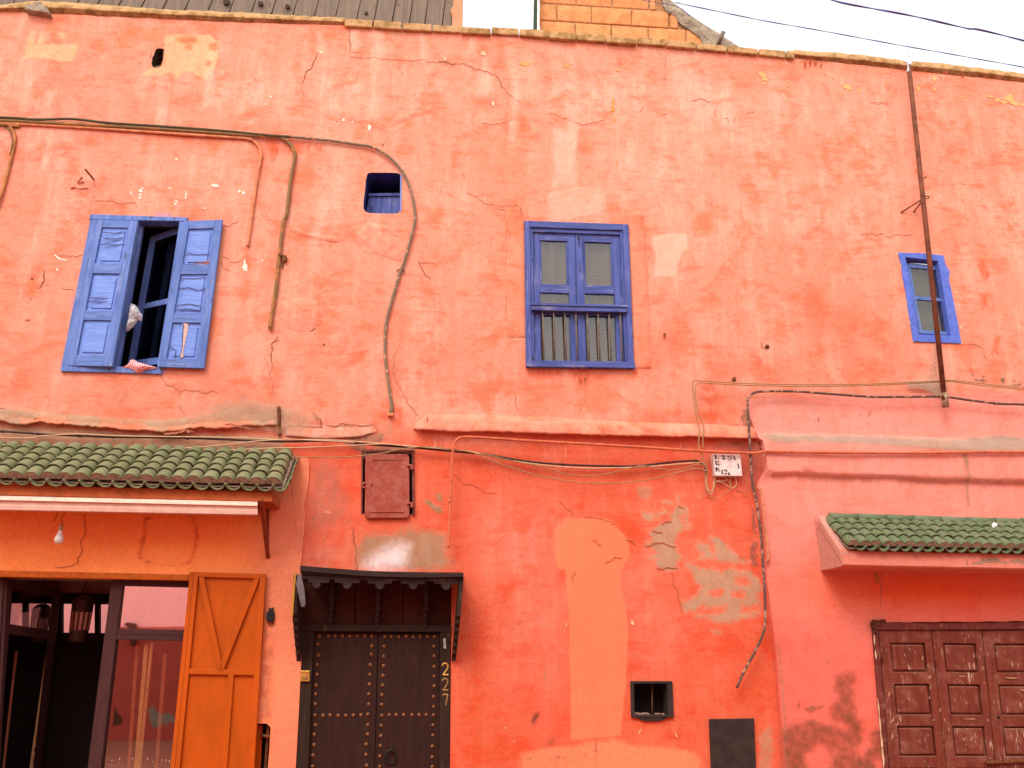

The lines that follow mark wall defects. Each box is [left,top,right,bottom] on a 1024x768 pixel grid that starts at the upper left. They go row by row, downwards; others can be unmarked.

crack [301,53,317,99]
crack [348,28,521,125]
crack [161,253,240,435]
crack [269,336,279,394]
crack [57,515,86,568]
crack [559,500,684,612]
peeling [641,497,762,624]
water stain [758,672,882,768]